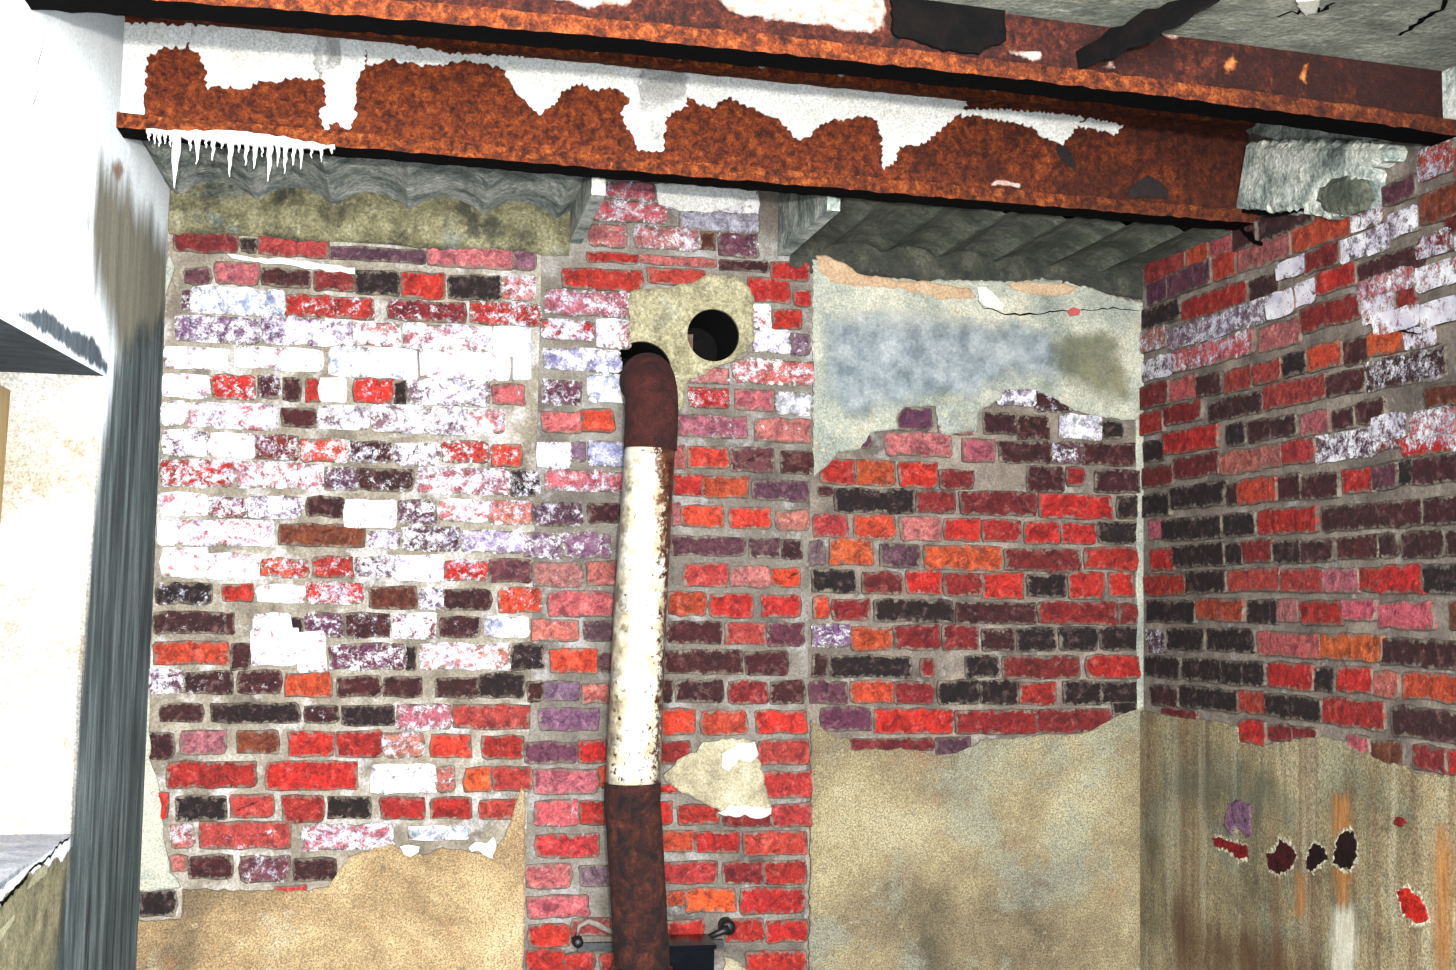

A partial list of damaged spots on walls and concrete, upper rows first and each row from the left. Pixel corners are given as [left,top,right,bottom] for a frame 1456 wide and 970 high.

corrosion [1057,144,1076,170]
corrosion [1128,176,1168,199]
water stain [1139,253,1316,382]
water stain [1340,195,1456,392]
water stain [686,304,1126,462]
spalling [806,138,1456,776]
water stain [1315,406,1456,464]
water stain [19,165,631,970]
spalling [139,232,545,921]
peeling [717,805,772,819]
spalling [1212,800,1360,878]
peeling [0,849,71,970]